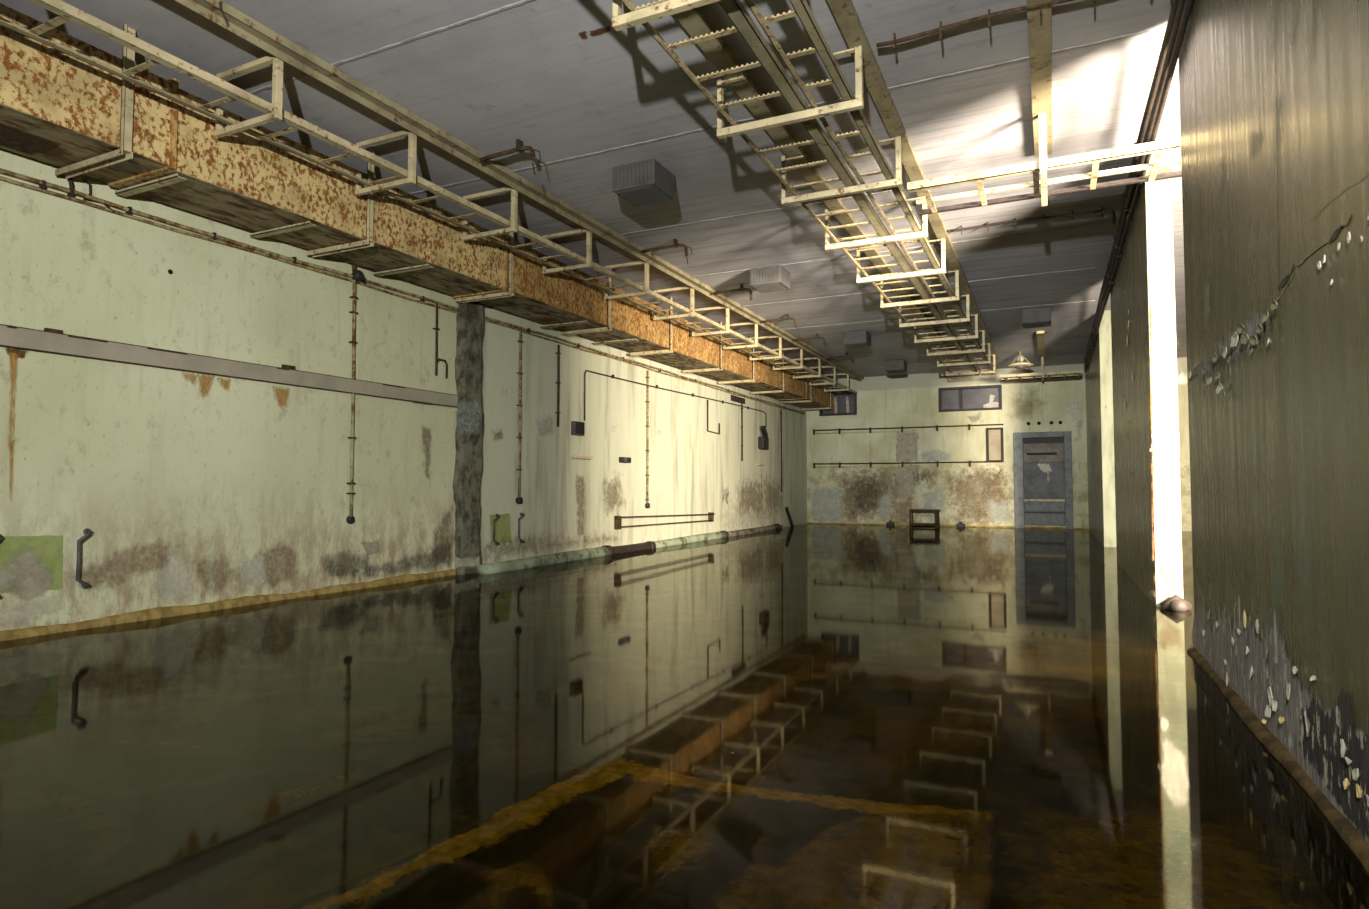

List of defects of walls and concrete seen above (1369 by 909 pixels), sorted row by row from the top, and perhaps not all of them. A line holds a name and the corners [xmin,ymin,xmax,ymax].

crack [1239,98,1369,390]
peeling [1317,232,1364,285]
damp [458,301,478,321]
peeling [1188,300,1278,399]
rust [0,324,458,488]
damp [328,478,584,573]
damp [842,474,911,521]
damp [952,473,1004,522]
peeling [1150,410,1179,498]
damp [85,547,295,602]
peeling [1192,596,1369,843]